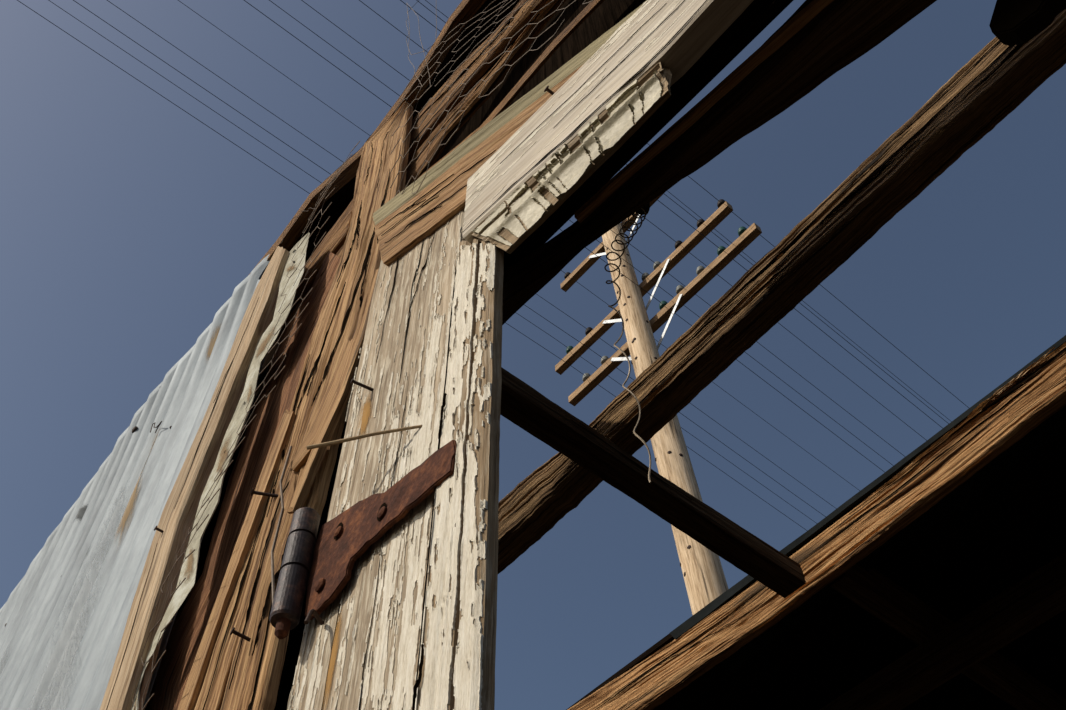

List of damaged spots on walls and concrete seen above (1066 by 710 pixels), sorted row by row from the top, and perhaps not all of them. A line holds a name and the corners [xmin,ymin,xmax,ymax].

peeling [287,0,695,710]
crack [293,0,707,487]
crack [572,40,1025,499]
crack [203,448,290,710]
crack [321,590,343,710]
crack [358,537,384,710]
crack [412,487,436,710]